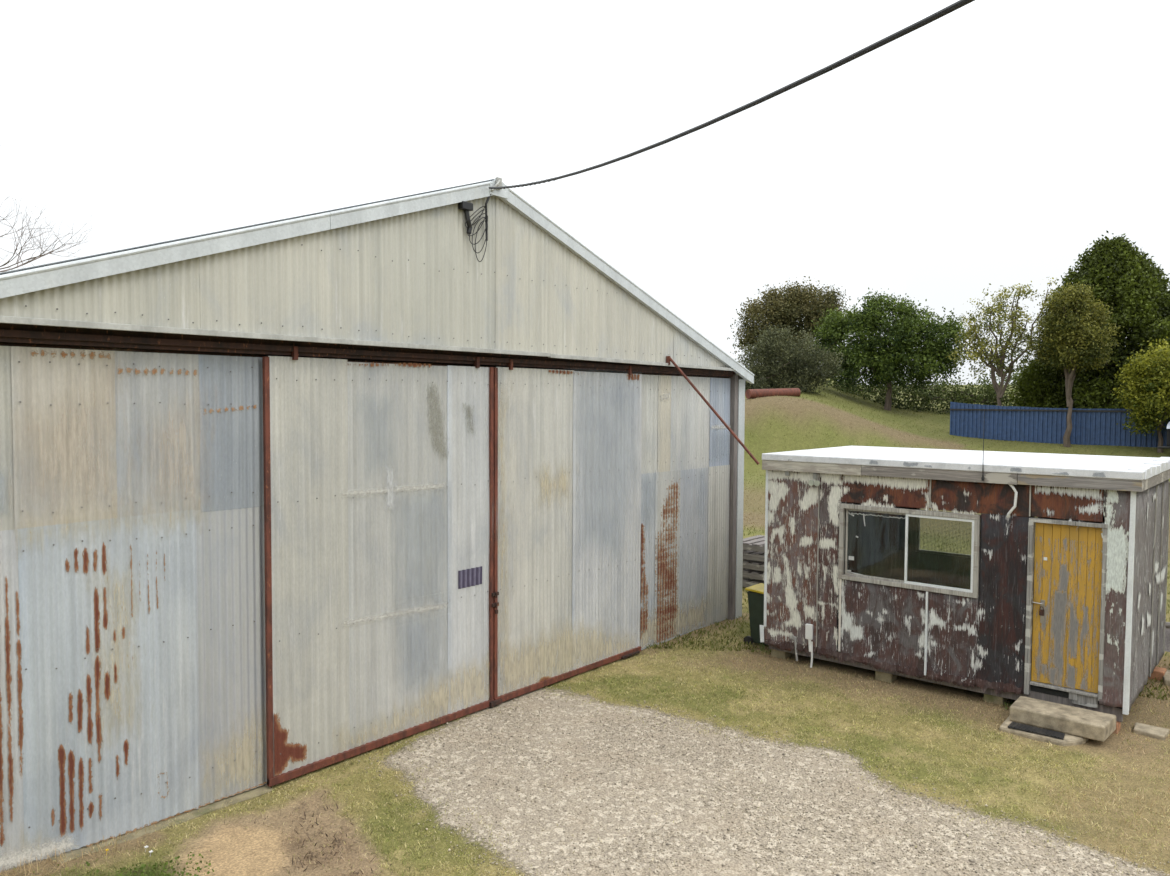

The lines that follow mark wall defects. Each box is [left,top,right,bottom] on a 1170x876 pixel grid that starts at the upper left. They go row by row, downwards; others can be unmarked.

corrosion [0,578,24,846]
corrosion [51,543,165,837]
corrosion [86,714,307,847]
corrosion [640,482,680,643]
peeling [763,459,1168,694]